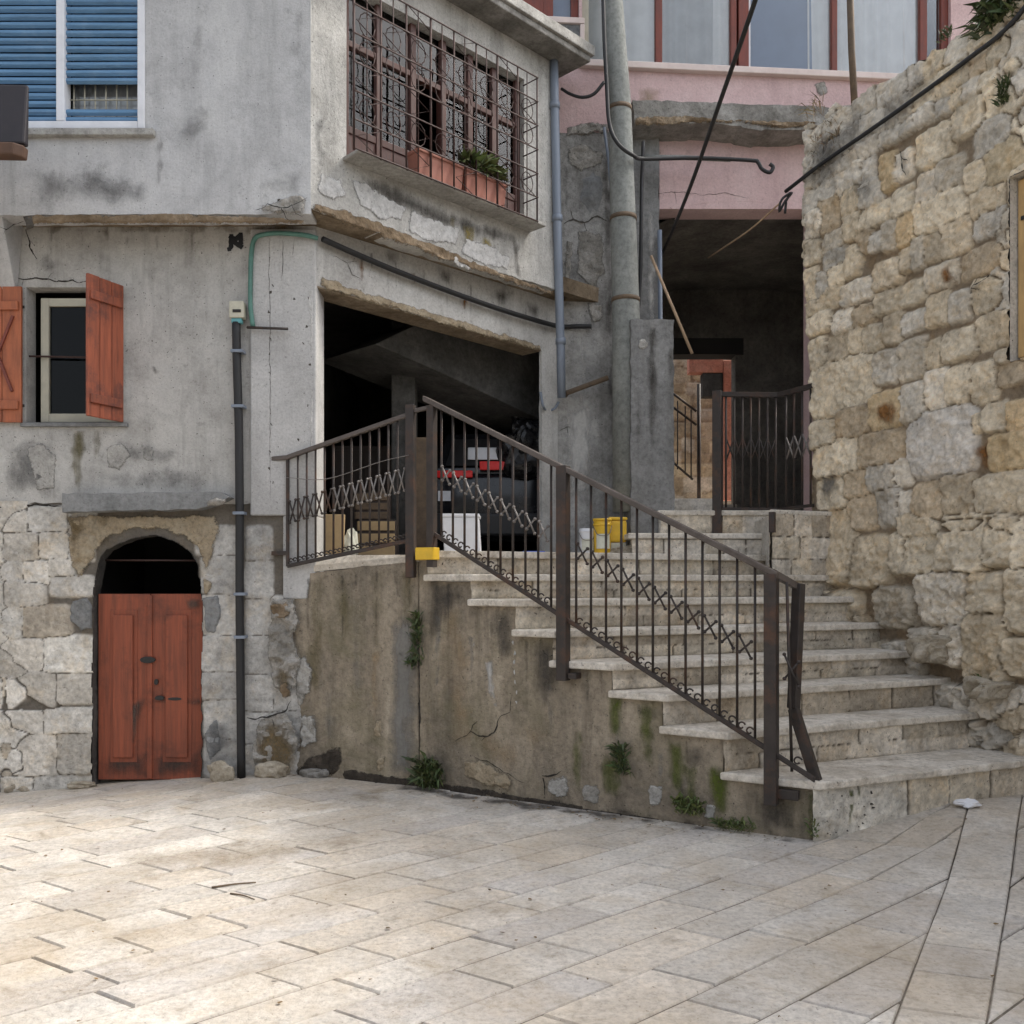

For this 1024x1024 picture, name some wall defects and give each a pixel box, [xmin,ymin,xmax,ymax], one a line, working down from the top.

crack [1,222,86,284]
crack [257,198,306,294]
peeling [23,173,553,294]
crack [564,208,607,231]
damp [74,435,83,466]
spalling [68,497,226,594]
spalling [252,599,662,820]
crack [456,696,561,795]